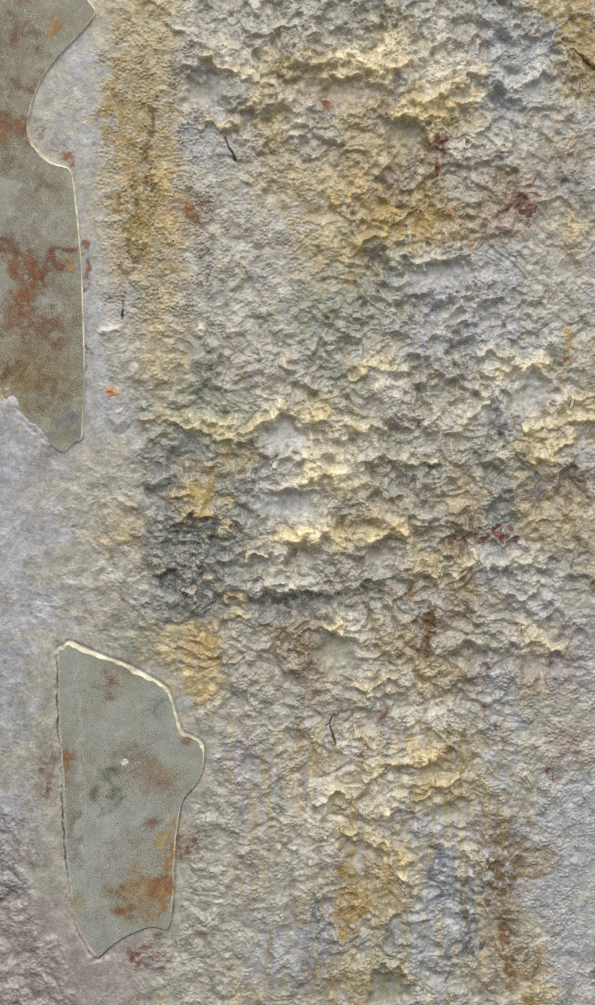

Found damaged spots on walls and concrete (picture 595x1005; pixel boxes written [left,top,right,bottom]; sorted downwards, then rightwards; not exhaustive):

flaking render [162,0,515,166]
rust [0,238,90,334]
flaking render [341,207,487,298]
flaking render [138,359,440,469]
flaking render [418,337,595,468]
flaking render [353,515,451,613]
flaking render [486,546,546,603]
flaking render [252,570,400,703]
flaking render [521,621,573,679]
flaking render [353,714,479,826]
rust [110,808,198,917]
flaking render [305,785,420,900]